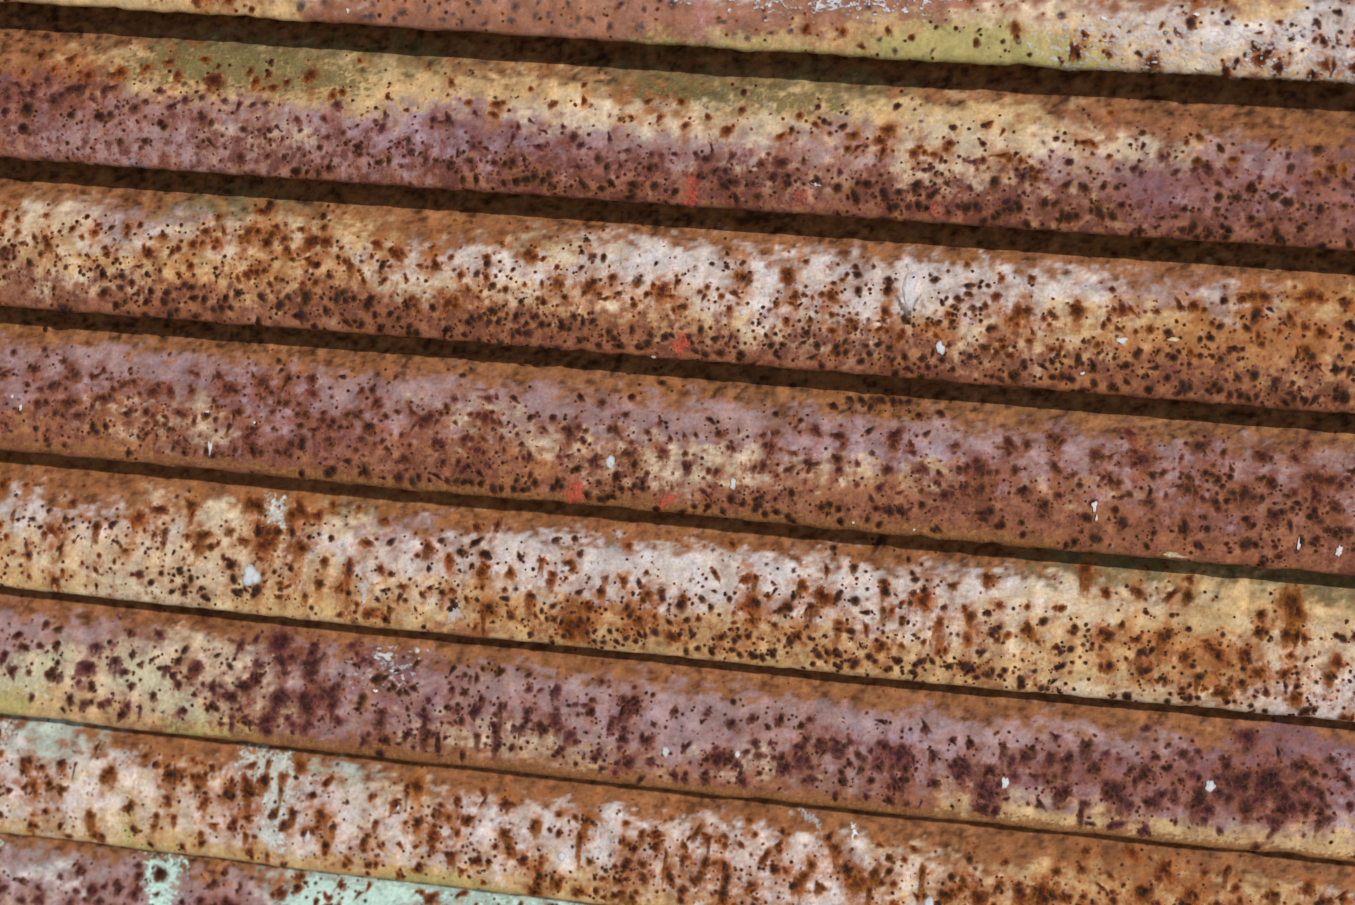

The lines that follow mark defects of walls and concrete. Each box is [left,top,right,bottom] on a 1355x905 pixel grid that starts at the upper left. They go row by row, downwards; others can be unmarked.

corrosion [361,0,408,21]
corrosion [423,0,517,32]
corrosion [533,0,625,38]
corrosion [636,0,676,31]
corrosion [745,8,916,60]
corrosion [929,10,1037,58]
corrosion [1057,15,1116,68]
corrosion [1135,0,1355,82]
corrosion [0,51,1355,249]
corrosion [0,199,1355,722]
corrosion [0,617,1355,905]